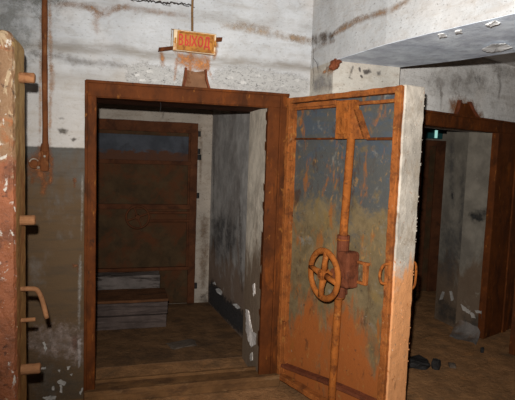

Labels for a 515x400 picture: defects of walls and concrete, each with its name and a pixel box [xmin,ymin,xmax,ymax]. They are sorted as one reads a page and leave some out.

water stain [312,11,385,42]
spalling [482,43,512,53]
corrosion [178,53,209,71]
spalling [208,281,256,361]
peeling [42,379,66,400]